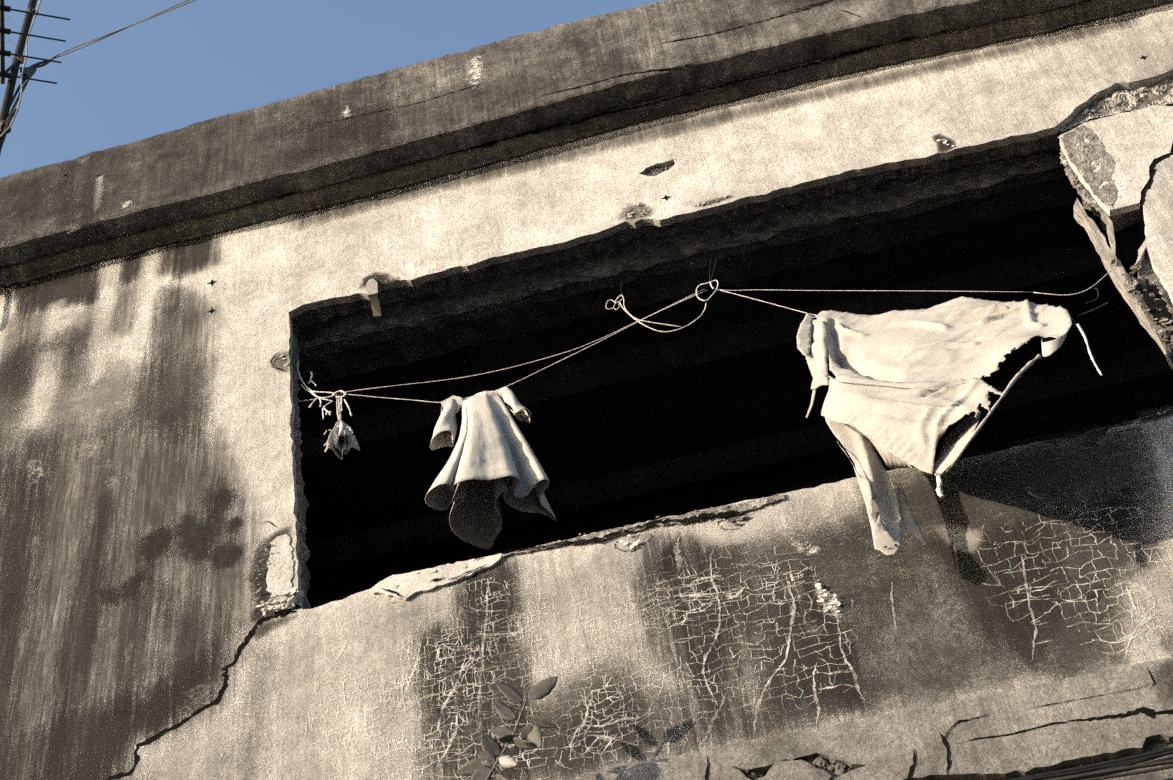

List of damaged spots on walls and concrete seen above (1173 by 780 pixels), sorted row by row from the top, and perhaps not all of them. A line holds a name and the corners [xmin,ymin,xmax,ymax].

crack [439,0,954,156]
flaking render [1058,76,1173,212]
flaking render [1121,266,1173,364]
flaking render [1139,406,1173,422]
crack [105,605,302,780]
flaking render [250,528,304,621]
crack [305,510,858,780]
crack [907,492,1173,780]
flaking render [742,771,766,780]
flaking render [809,756,855,777]